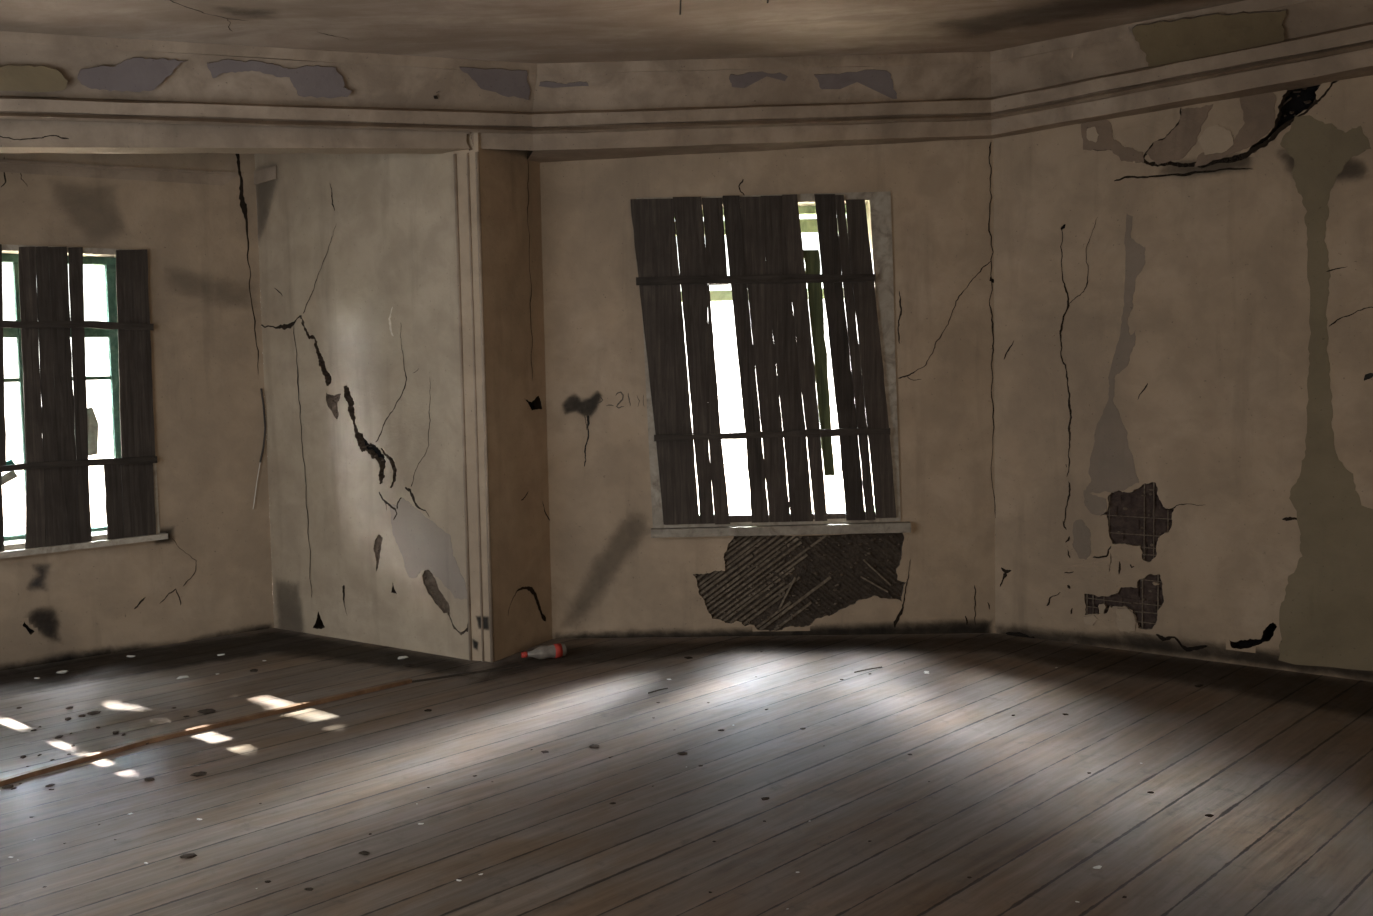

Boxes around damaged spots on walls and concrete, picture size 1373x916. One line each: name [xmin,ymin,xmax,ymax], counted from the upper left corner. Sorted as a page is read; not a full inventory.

crack [1093,80,1339,181]
crack [235,154,431,519]
spalling [693,533,906,631]
crack [965,567,1011,625]
crack [1046,222,1134,614]
peeling [1072,85,1373,671]